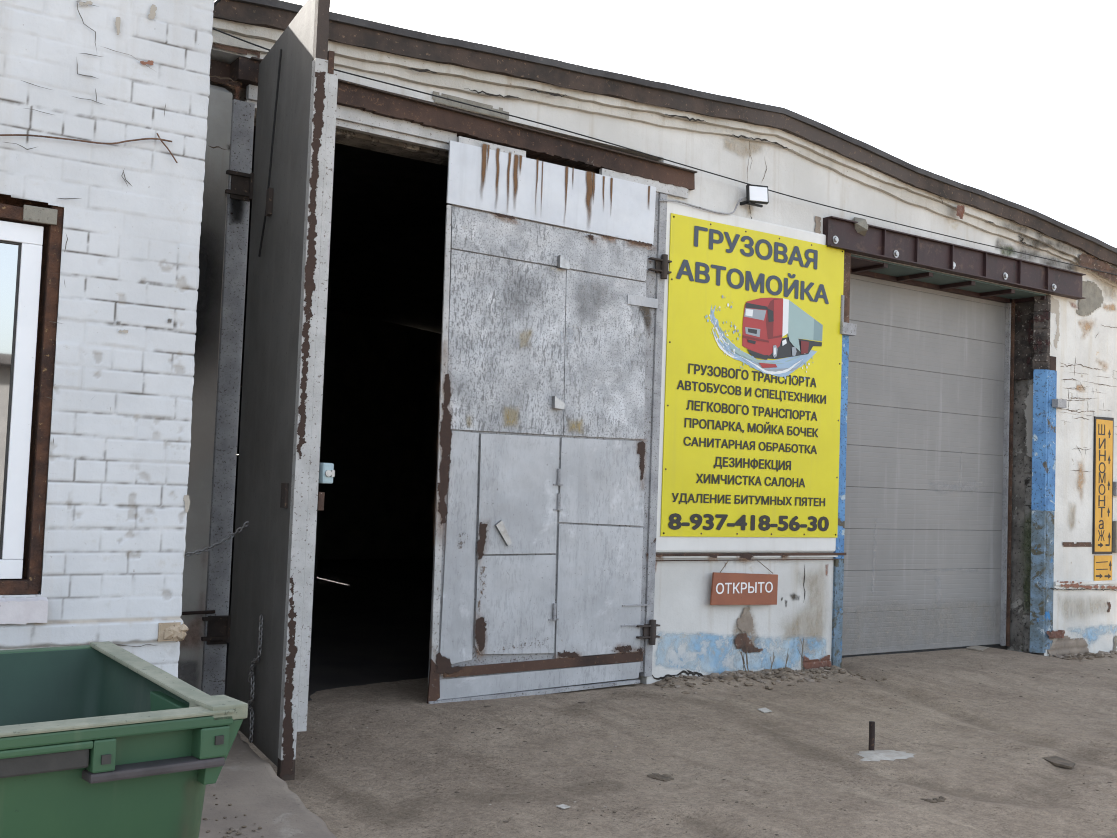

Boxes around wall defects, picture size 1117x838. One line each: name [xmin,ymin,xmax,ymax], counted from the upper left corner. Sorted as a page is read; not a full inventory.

corrosion [481,144,522,197]
corrosion [565,166,613,218]
corrosion [578,232,652,246]
corrosion [297,72,326,459]
flaking render [1079,253,1117,284]
corrosion [437,374,453,525]
corrosion [458,522,580,658]
corrosion [434,638,467,674]
corrosion [612,645,644,654]
flaking render [735,607,763,653]
flaking render [803,655,831,669]